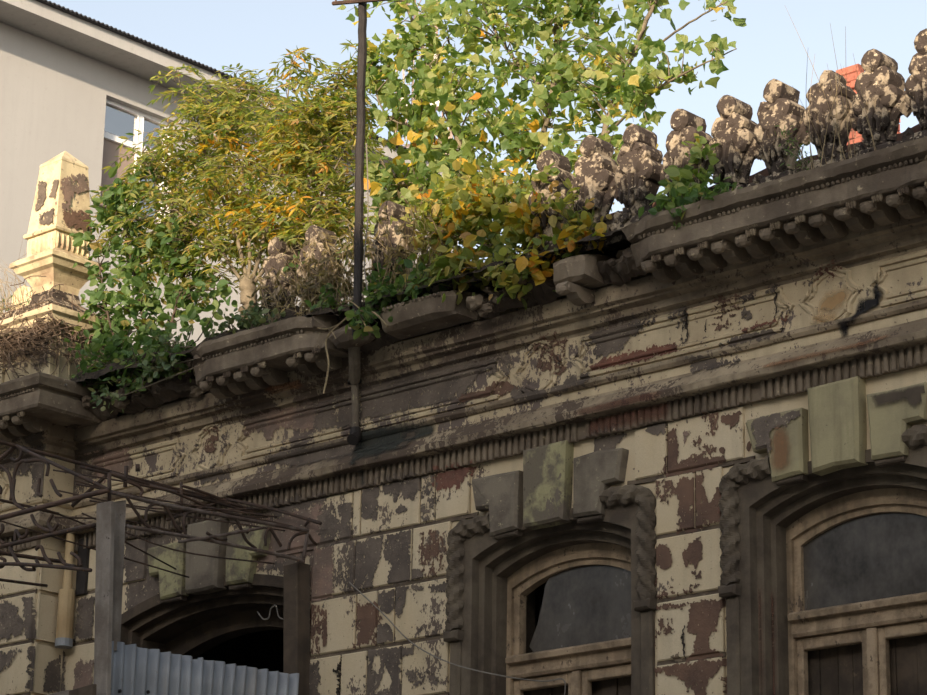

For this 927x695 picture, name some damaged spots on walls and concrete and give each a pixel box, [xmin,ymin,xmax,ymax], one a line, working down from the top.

peeling [35,173,92,233]
peeling [242,285,789,468]
peeling [0,440,45,499]
peeling [72,442,134,503]
peeling [202,426,222,454]
peeling [746,410,801,454]
peeling [123,459,477,695]
peeling [645,407,742,695]
peeling [0,596,95,695]